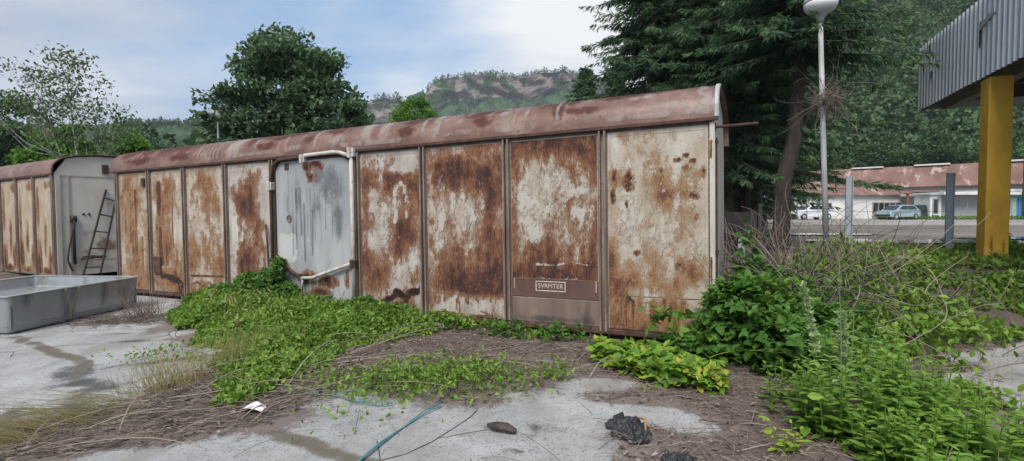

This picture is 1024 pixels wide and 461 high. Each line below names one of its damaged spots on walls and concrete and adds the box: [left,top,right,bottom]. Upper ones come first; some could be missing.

rust [456,109,508,127]
rust [535,89,679,119]
rust [247,126,361,149]
rust [301,160,324,183]
rust [0,180,53,274]
rust [83,144,272,293]
rust [360,131,713,333]
rust [303,269,349,296]